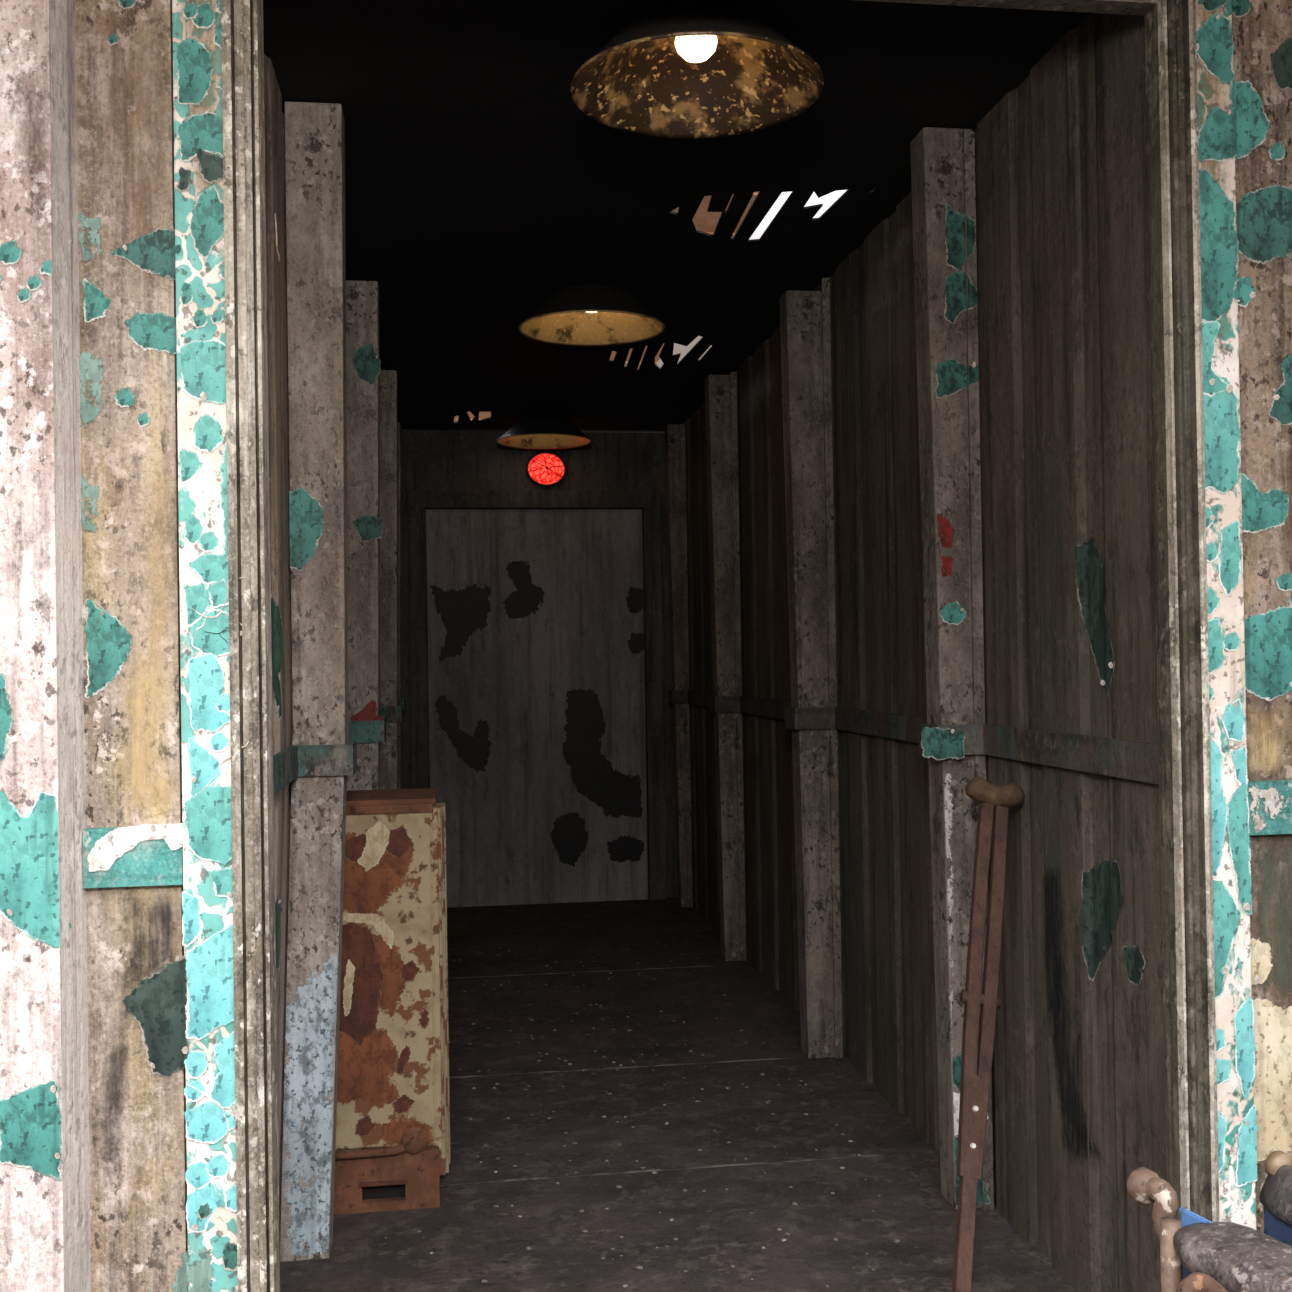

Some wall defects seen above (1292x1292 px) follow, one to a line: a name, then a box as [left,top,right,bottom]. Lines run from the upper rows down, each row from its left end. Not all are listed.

peeling [0,239,23,281]
peeling [16,260,52,303]
peeling [78,0,242,900]
peeling [1196,0,1292,1000]
peeling [0,791,71,948]
peeling [123,891,237,1292]
peeling [1216,938,1292,1187]